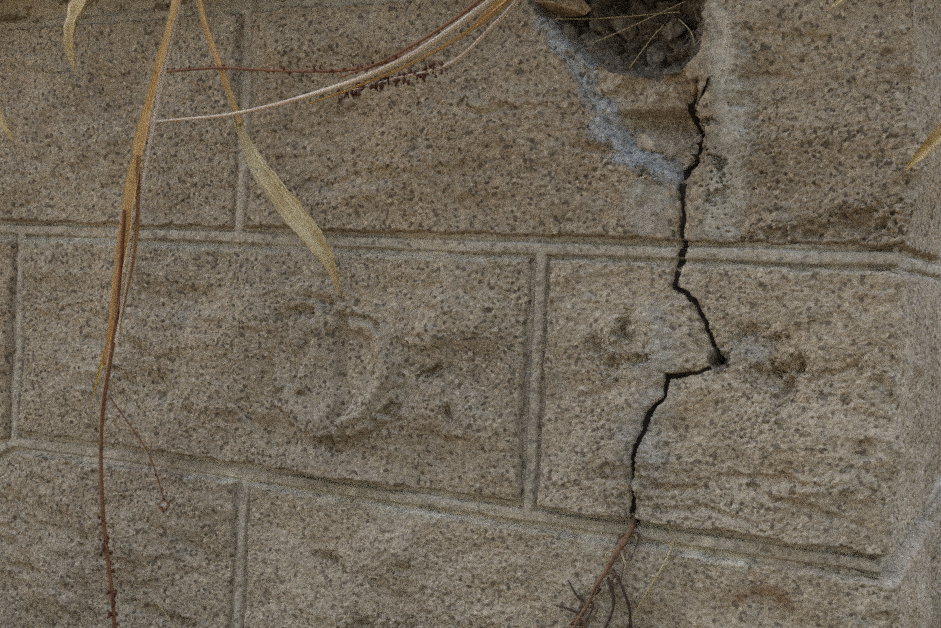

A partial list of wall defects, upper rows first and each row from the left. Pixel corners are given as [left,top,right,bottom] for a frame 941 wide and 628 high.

damp [533,14,688,237]
spalling [528,0,706,181]
crack [629,78,727,523]